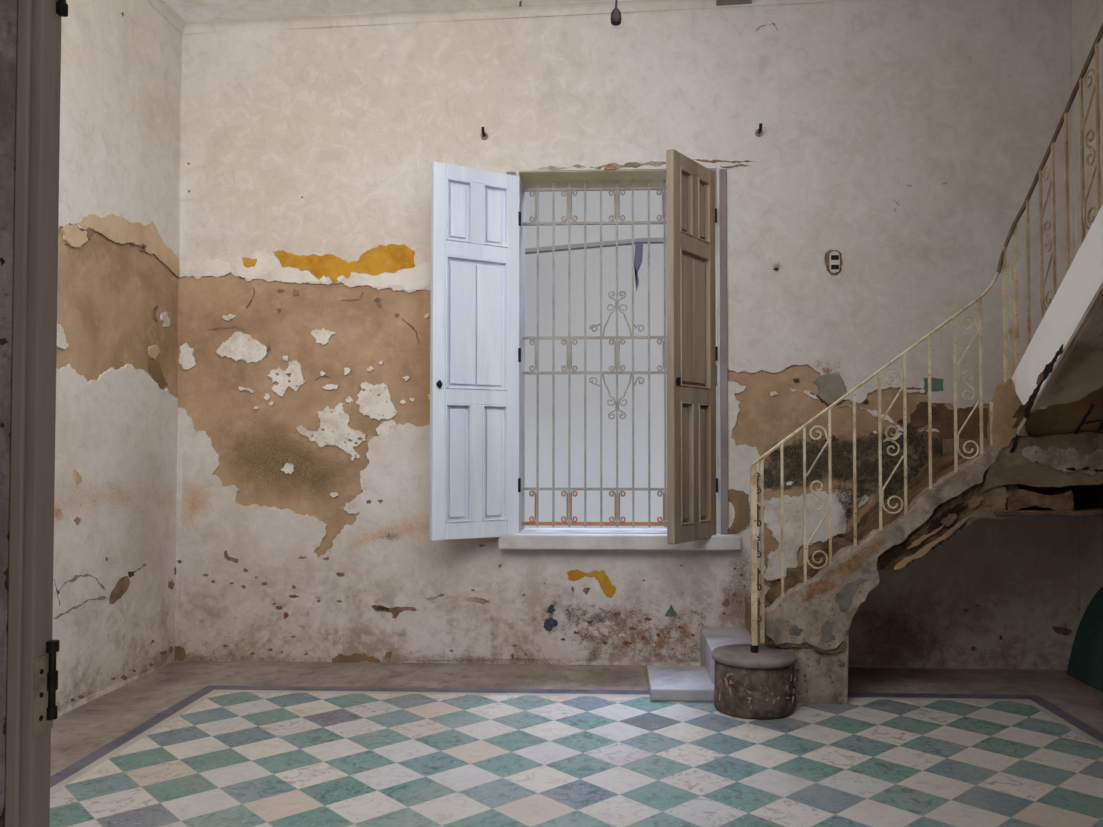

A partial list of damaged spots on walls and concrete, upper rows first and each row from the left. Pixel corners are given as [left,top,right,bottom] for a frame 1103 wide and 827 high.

spalling [56,213,431,560]
spalling [999,344,1103,485]
spalling [716,364,989,588]
crack [54,573,106,619]
spalling [109,571,134,604]
spalling [224,550,267,589]
spalling [371,605,417,619]
spalling [540,569,707,663]